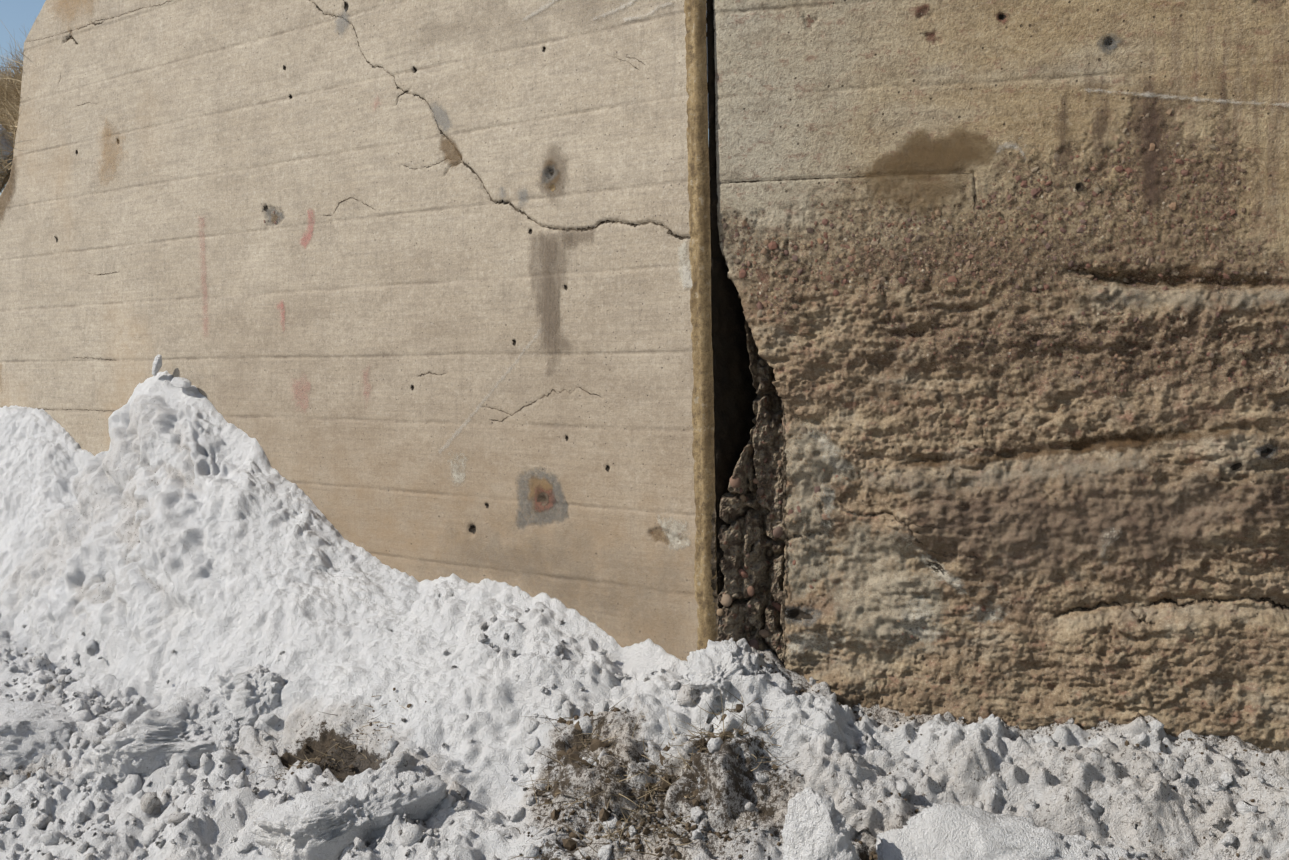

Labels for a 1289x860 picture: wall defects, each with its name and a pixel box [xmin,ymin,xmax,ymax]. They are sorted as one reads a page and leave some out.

crack [28,0,172,42]
crack [309,0,691,240]
damp [868,131,1016,204]
spalling [716,96,1289,665]
crack [1057,597,1289,625]